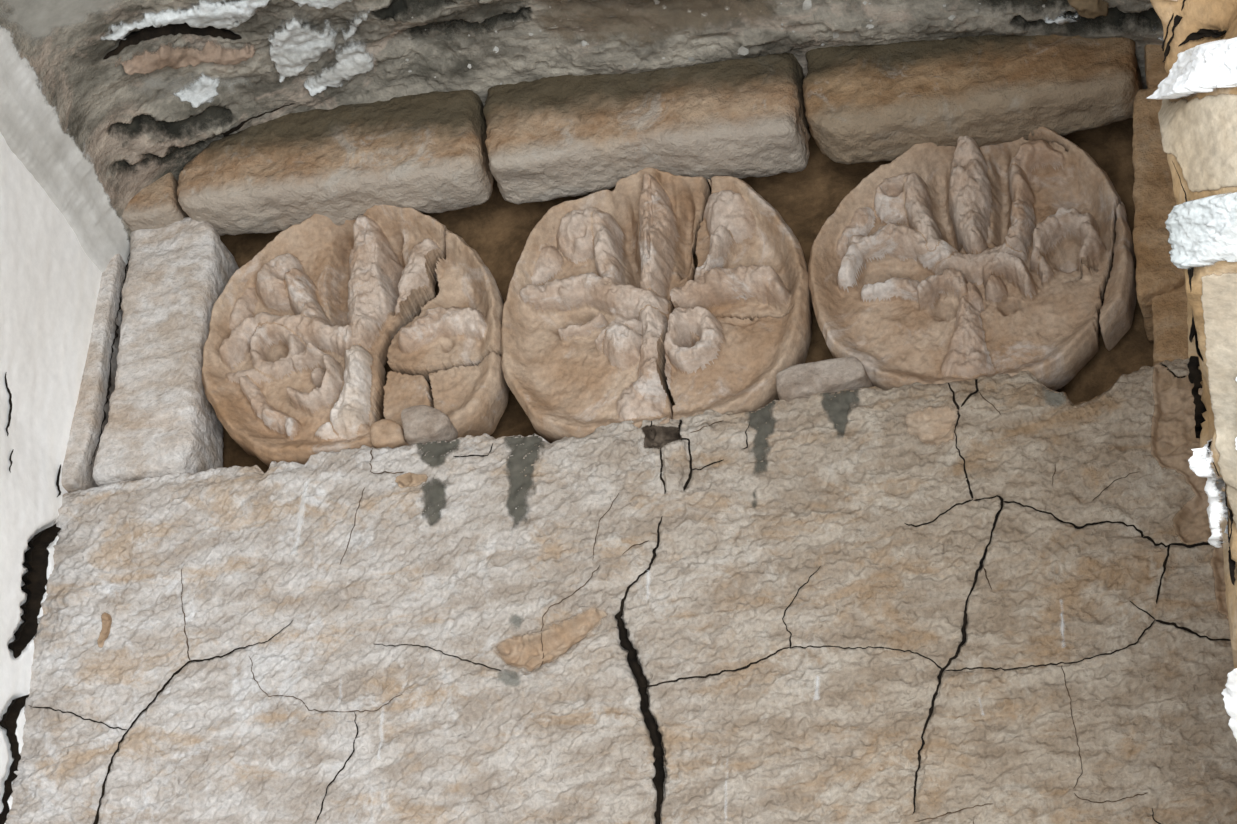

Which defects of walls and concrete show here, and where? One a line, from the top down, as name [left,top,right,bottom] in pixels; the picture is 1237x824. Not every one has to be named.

spalling [988,0,1163,40]
crack [1161,0,1227,63]
peeling [102,0,531,172]
crack [5,373,14,473]
water stain [417,439,459,525]
water stain [504,434,544,525]
water stain [749,401,776,473]
water stain [822,389,859,436]
crack [8,465,61,658]
crack [540,267,1236,824]
crack [0,569,402,824]
crack [375,644,501,671]